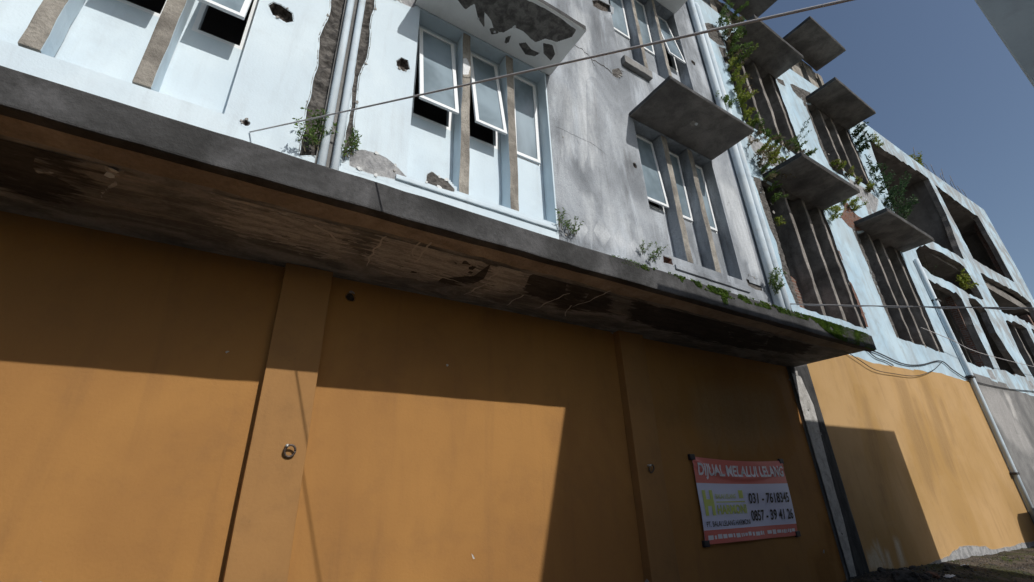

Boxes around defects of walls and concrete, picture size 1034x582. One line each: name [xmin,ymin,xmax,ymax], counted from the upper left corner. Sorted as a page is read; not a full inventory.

spalling [265,0,296,25]
peeling [455,0,579,62]
spalling [294,0,345,161]
spalling [340,0,457,194]
leakage [0,139,171,227]
flaking render [353,228,547,305]